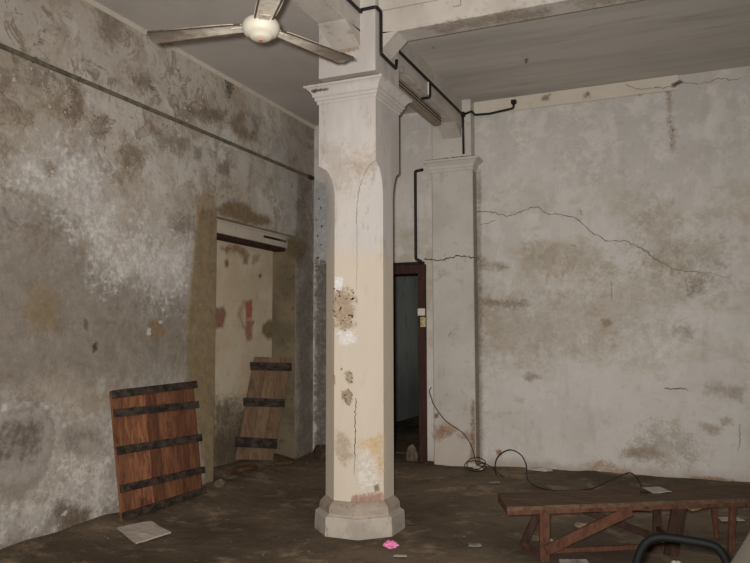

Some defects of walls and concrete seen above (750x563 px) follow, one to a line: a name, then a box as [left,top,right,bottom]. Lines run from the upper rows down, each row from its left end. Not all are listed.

crack [625,77,743,98]
leakage [1,128,200,311]
leakage [218,203,270,225]
crack [424,254,475,262]
crack [477,207,699,273]
flaking render [246,300,254,340]
peeling [332,277,357,346]
spalling [342,371,353,405]
crack [351,398,359,469]